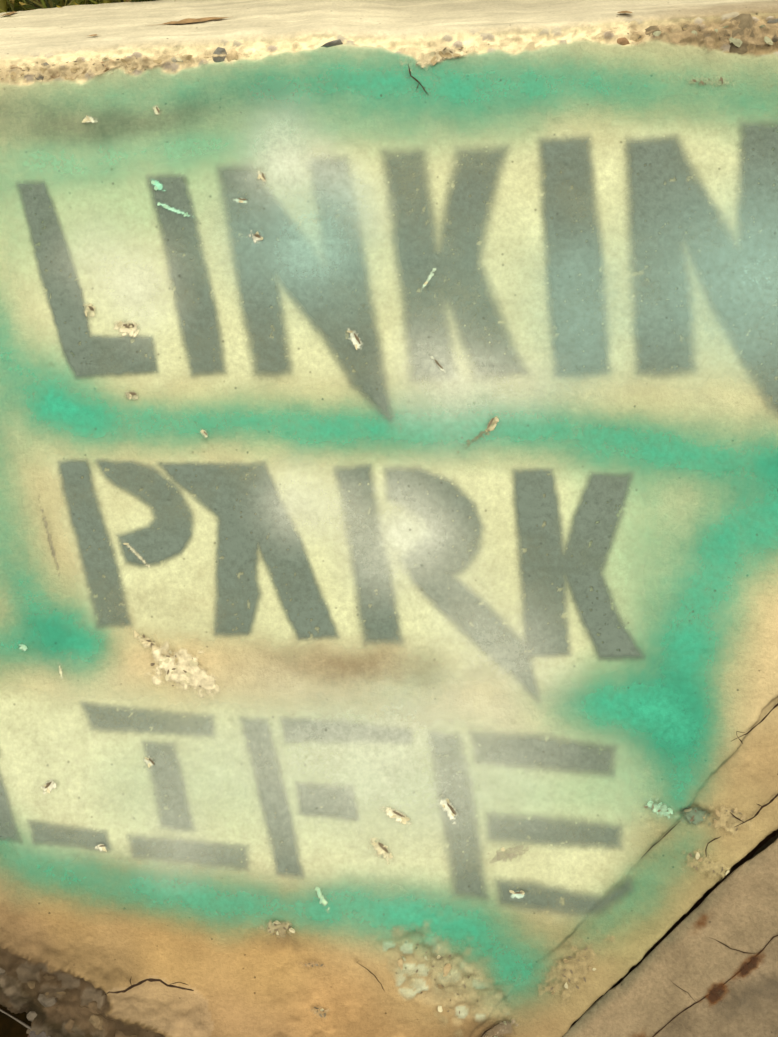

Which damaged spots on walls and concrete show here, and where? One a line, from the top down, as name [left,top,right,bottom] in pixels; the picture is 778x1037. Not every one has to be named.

spalling [0,47,252,83]
spalling [321,39,343,48]
spalling [410,47,475,71]
peeling [134,631,219,697]
crack [732,703,778,744]
crack [705,794,778,857]
spalling [268,921,295,937]
spalling [27,974,66,1021]
crack [105,976,194,995]
crack [653,935,778,1037]
spalling [64,1001,138,1037]